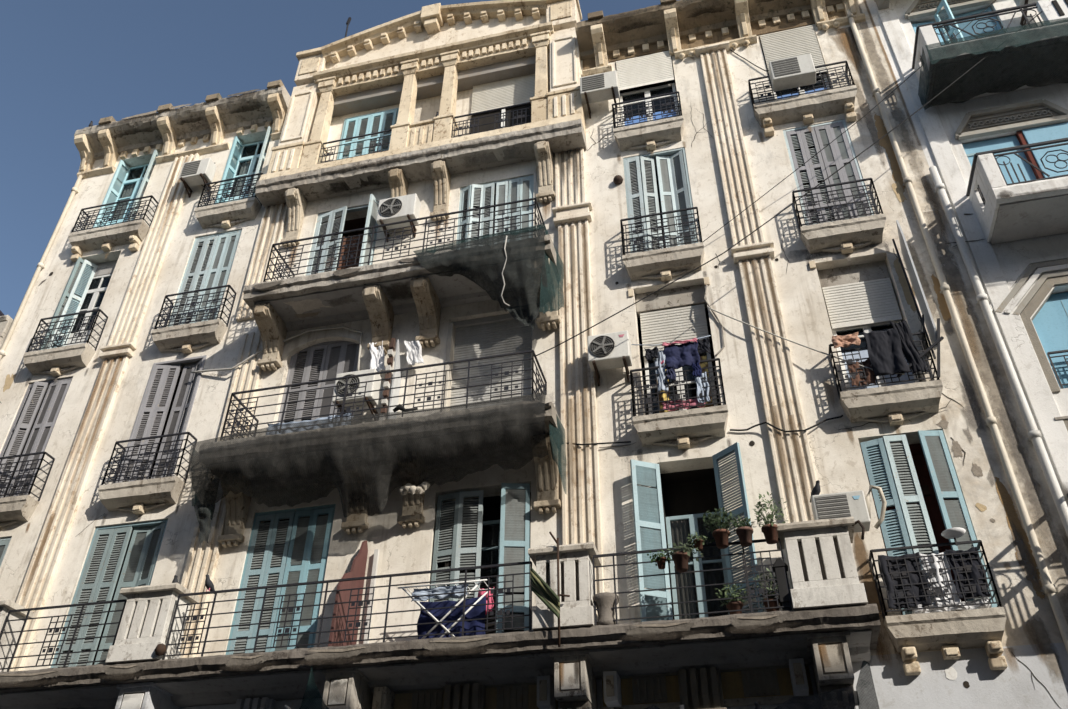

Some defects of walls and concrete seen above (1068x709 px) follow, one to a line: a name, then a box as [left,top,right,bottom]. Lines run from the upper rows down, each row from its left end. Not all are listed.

flaking render [874,112,907,202]
leakage [835,0,1068,601]
spalling [398,482,430,495]
flaking render [936,378,1045,599]
leakage [854,532,902,658]
crack [1012,653,1059,706]